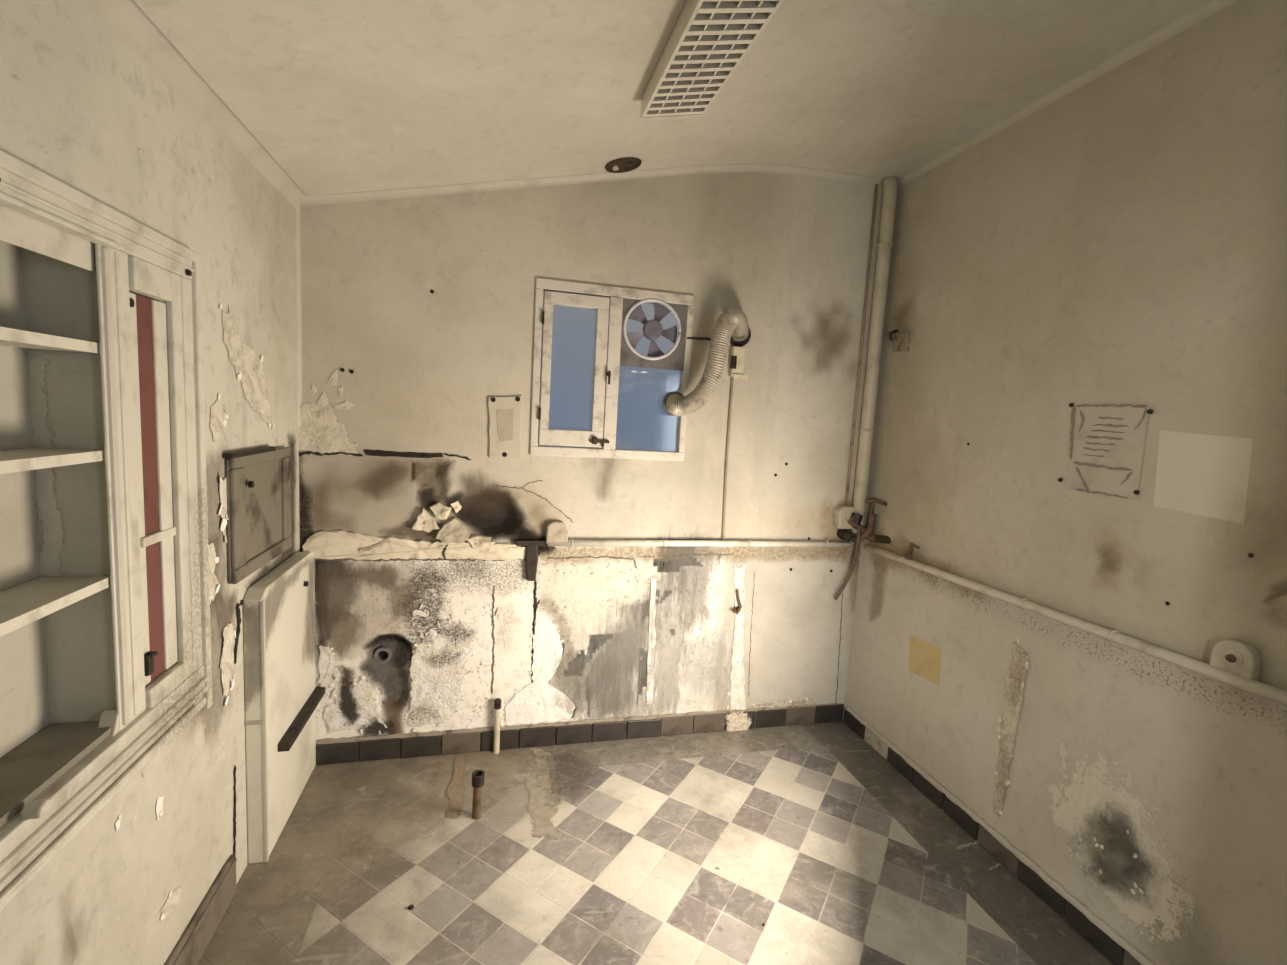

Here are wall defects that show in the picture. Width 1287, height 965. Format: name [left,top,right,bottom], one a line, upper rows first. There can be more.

peeling [219,304,274,429]
peeling [299,369,358,457]
water stain [251,439,480,737]